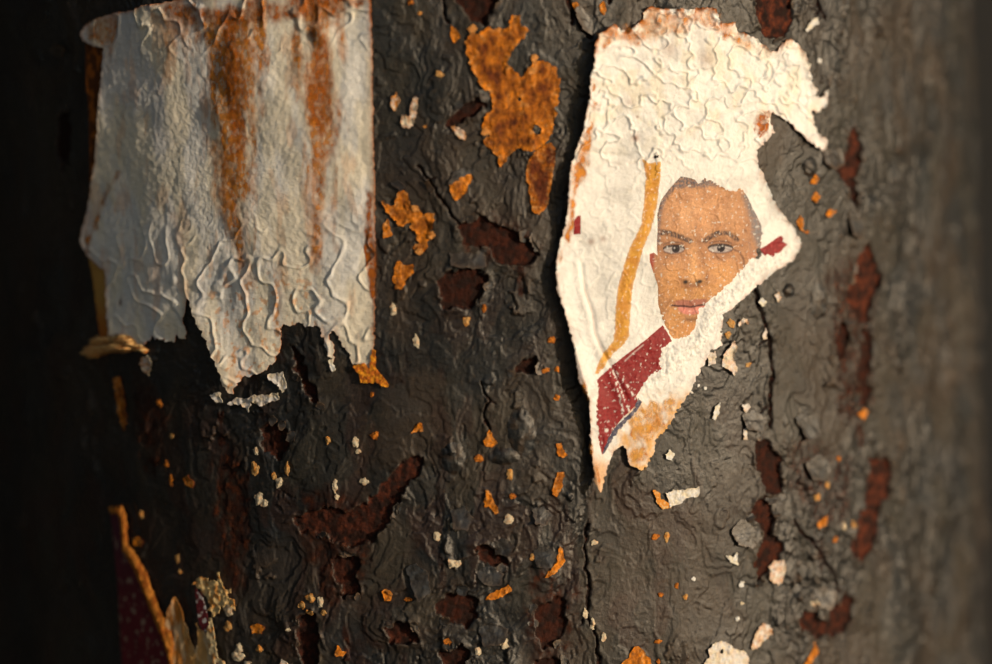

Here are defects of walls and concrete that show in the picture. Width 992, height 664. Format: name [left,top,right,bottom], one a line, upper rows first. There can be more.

crack [442,0,450,24]
crack [566,0,593,39]
rust [445,89,491,127]
peeling [449,249,487,269]
peeling [532,506,553,526]
peeling [530,545,556,569]
peeling [406,563,431,603]
crack [579,523,601,664]
peeling [475,623,509,656]